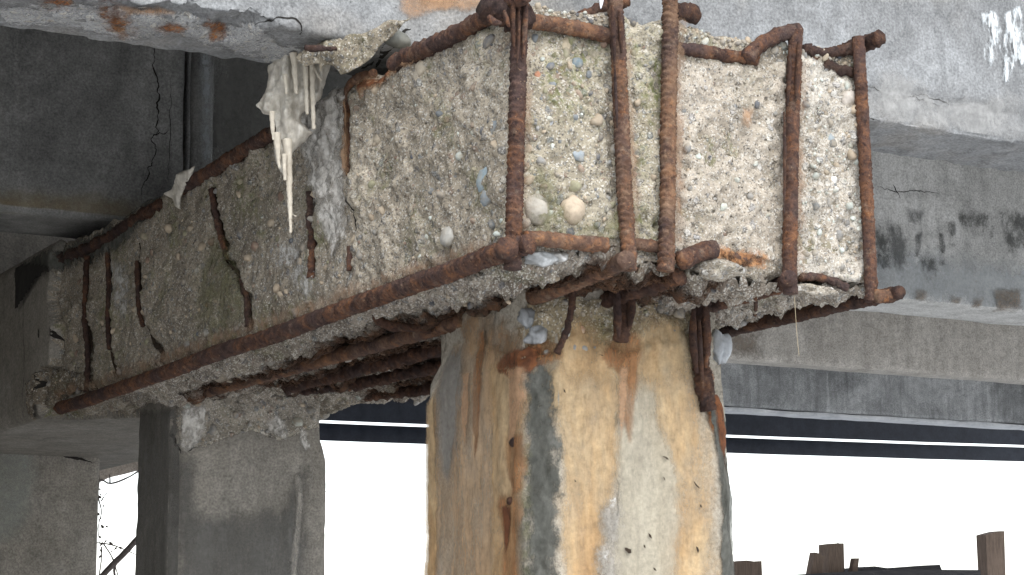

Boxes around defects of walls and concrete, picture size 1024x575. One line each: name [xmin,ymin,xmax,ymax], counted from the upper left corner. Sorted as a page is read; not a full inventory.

spalling [25,279,99,420]
spalling [0,3,302,63]
crack [141,48,172,200]
rust [179,296,513,405]
spalling [100,16,865,448]
rust [497,343,562,575]
spalling [534,2,608,26]
damp [424,321,734,575]
rust [610,5,638,205]
rust [532,253,726,461]
rust [783,42,805,239]
damp [876,214,1024,307]